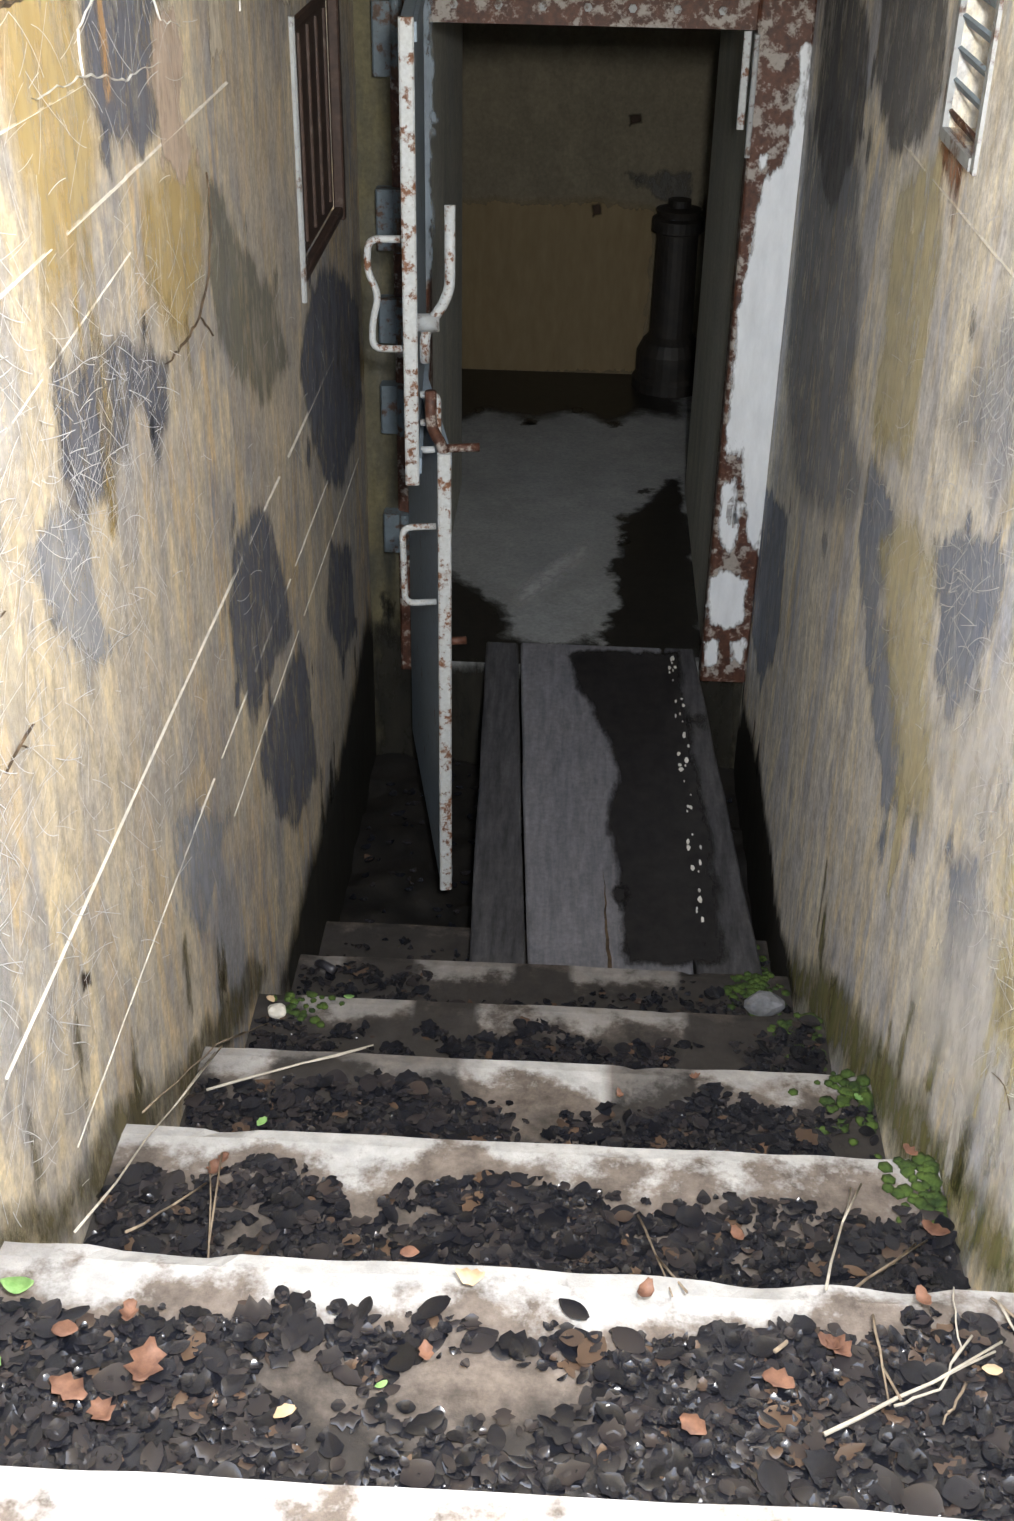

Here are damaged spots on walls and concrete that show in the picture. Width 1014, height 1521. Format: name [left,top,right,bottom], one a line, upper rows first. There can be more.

crack [0,0,23,9]
crack [153,0,181,27]
crack [31,0,162,100]